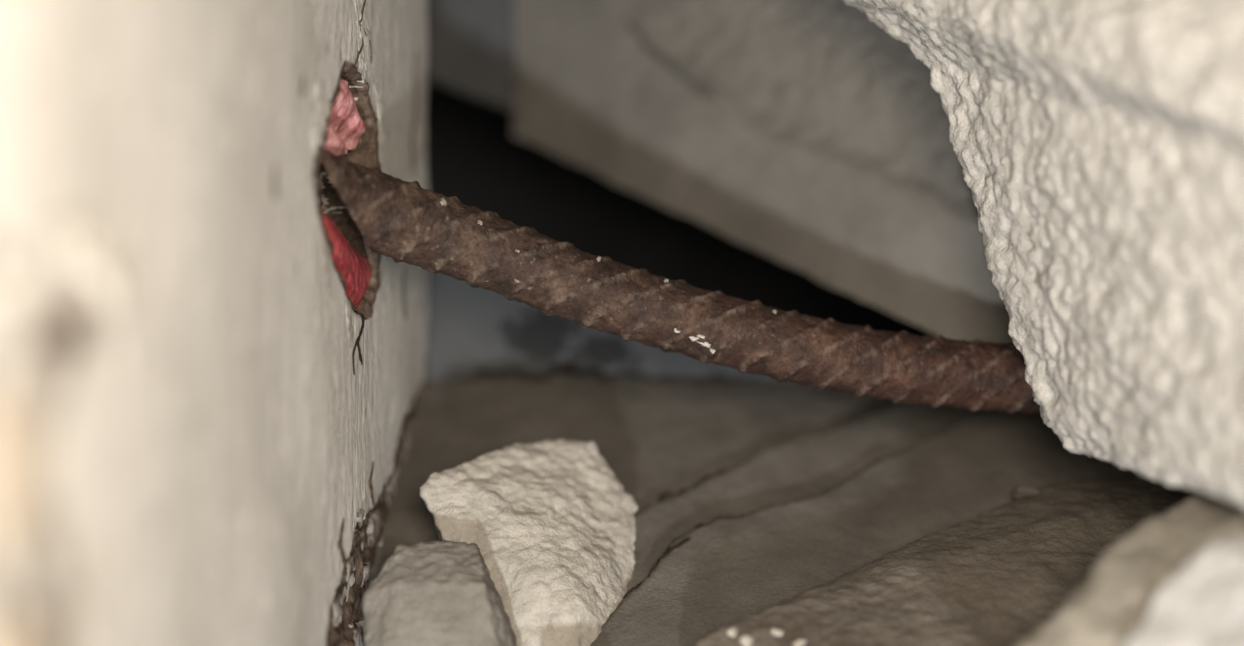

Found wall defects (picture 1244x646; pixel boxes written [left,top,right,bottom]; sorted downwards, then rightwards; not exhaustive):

crack [354,0,372,66]
spalling [311,0,1040,414]